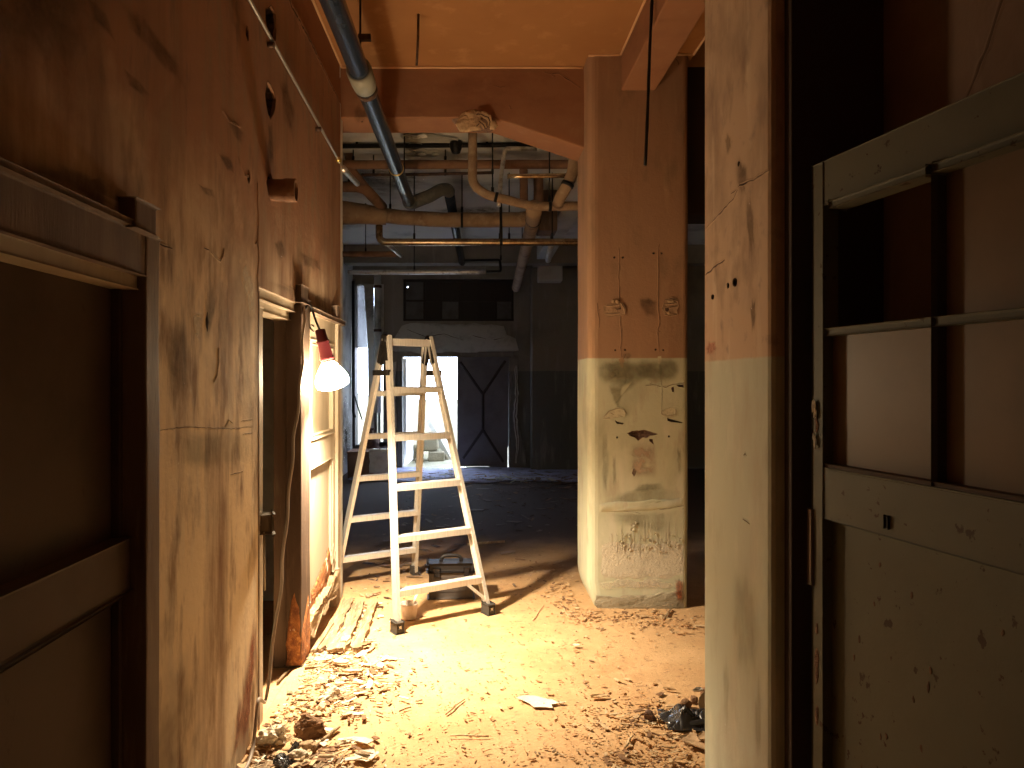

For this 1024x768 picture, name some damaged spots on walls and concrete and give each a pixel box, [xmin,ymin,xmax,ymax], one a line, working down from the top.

spalling [615,420,657,444]
rust [286,547,332,666]